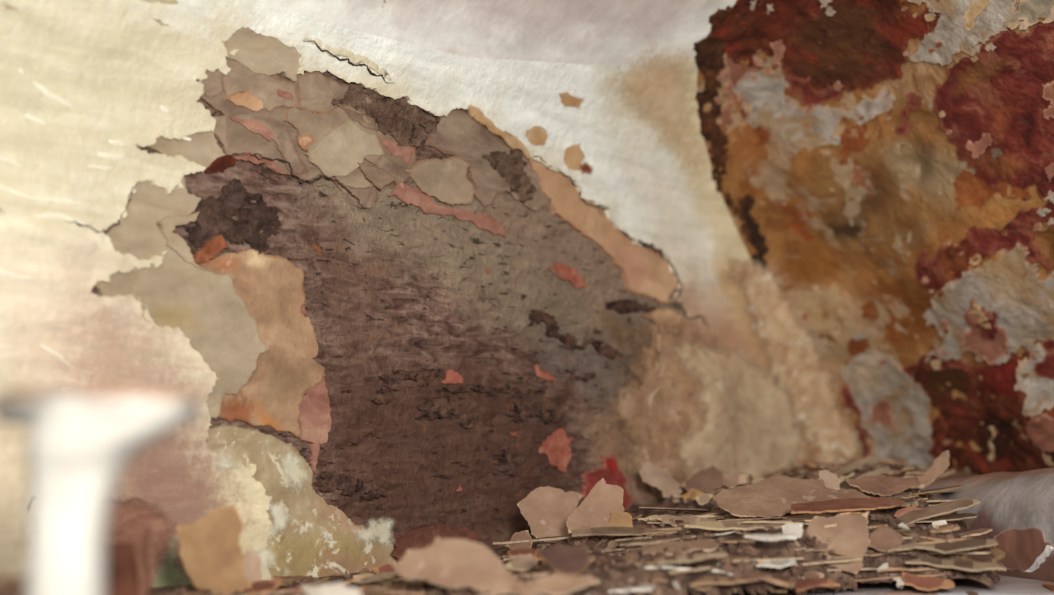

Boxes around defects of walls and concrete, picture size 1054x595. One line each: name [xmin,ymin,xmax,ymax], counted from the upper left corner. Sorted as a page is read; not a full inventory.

rust [721,0,940,108]
leakage [622,55,700,167]
rust [835,123,870,166]
rust [913,169,1054,294]
peeling [91,0,934,595]
rust [847,337,869,357]
rust [903,350,1054,475]
leakage [257,550,274,567]
leakage [271,503,288,536]
leakage [282,453,307,487]
leakage [358,519,392,543]
peeling [638,466,1054,595]